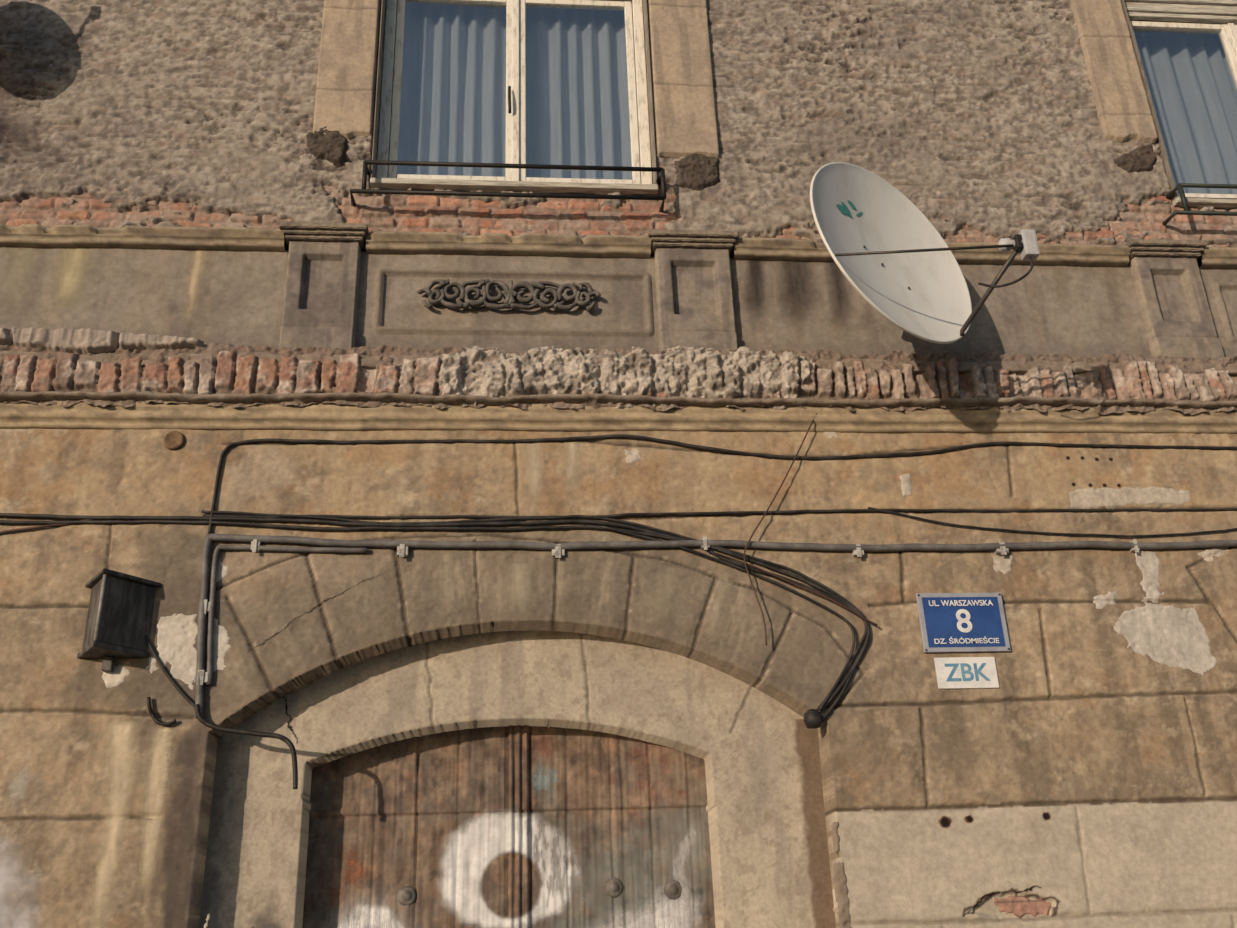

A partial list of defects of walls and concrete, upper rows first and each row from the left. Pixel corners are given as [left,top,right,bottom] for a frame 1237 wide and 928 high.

spalling [306,126,349,168]
spalling [1113,144,1157,173]
flaking render [0,192,293,229]
flaking render [624,449,643,463]
flaking render [993,555,1012,574]
flaking render [1198,547,1229,562]
crack [256,575,379,647]
flaking render [1093,549,1217,676]
flaking render [146,613,198,690]
flaking render [213,619,231,672]
flaking render [102,665,130,688]
spalling [963,888,1059,919]